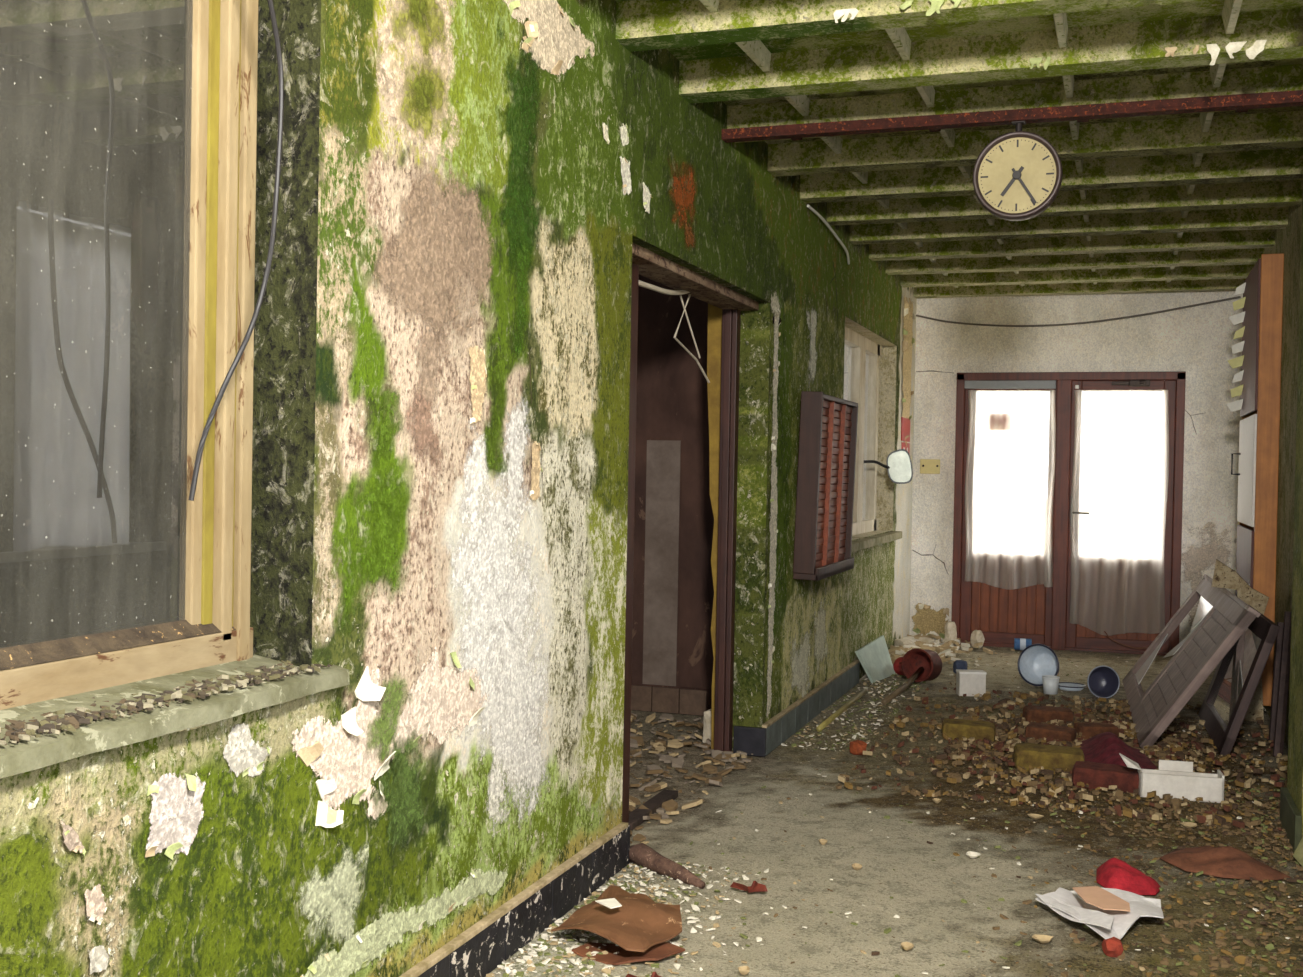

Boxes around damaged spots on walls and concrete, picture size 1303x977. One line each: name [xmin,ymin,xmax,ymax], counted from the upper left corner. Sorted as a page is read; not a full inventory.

peeling [502,0,595,76]
damp [374,0,541,460]
peeling [602,123,652,213]
rust [670,163,696,247]
damp [452,362,548,823]
damp [1181,522,1230,624]
peeling [223,723,272,777]
damp [367,679,411,760]
peeling [291,646,489,828]
peeling [145,772,206,860]
damp [301,846,369,941]